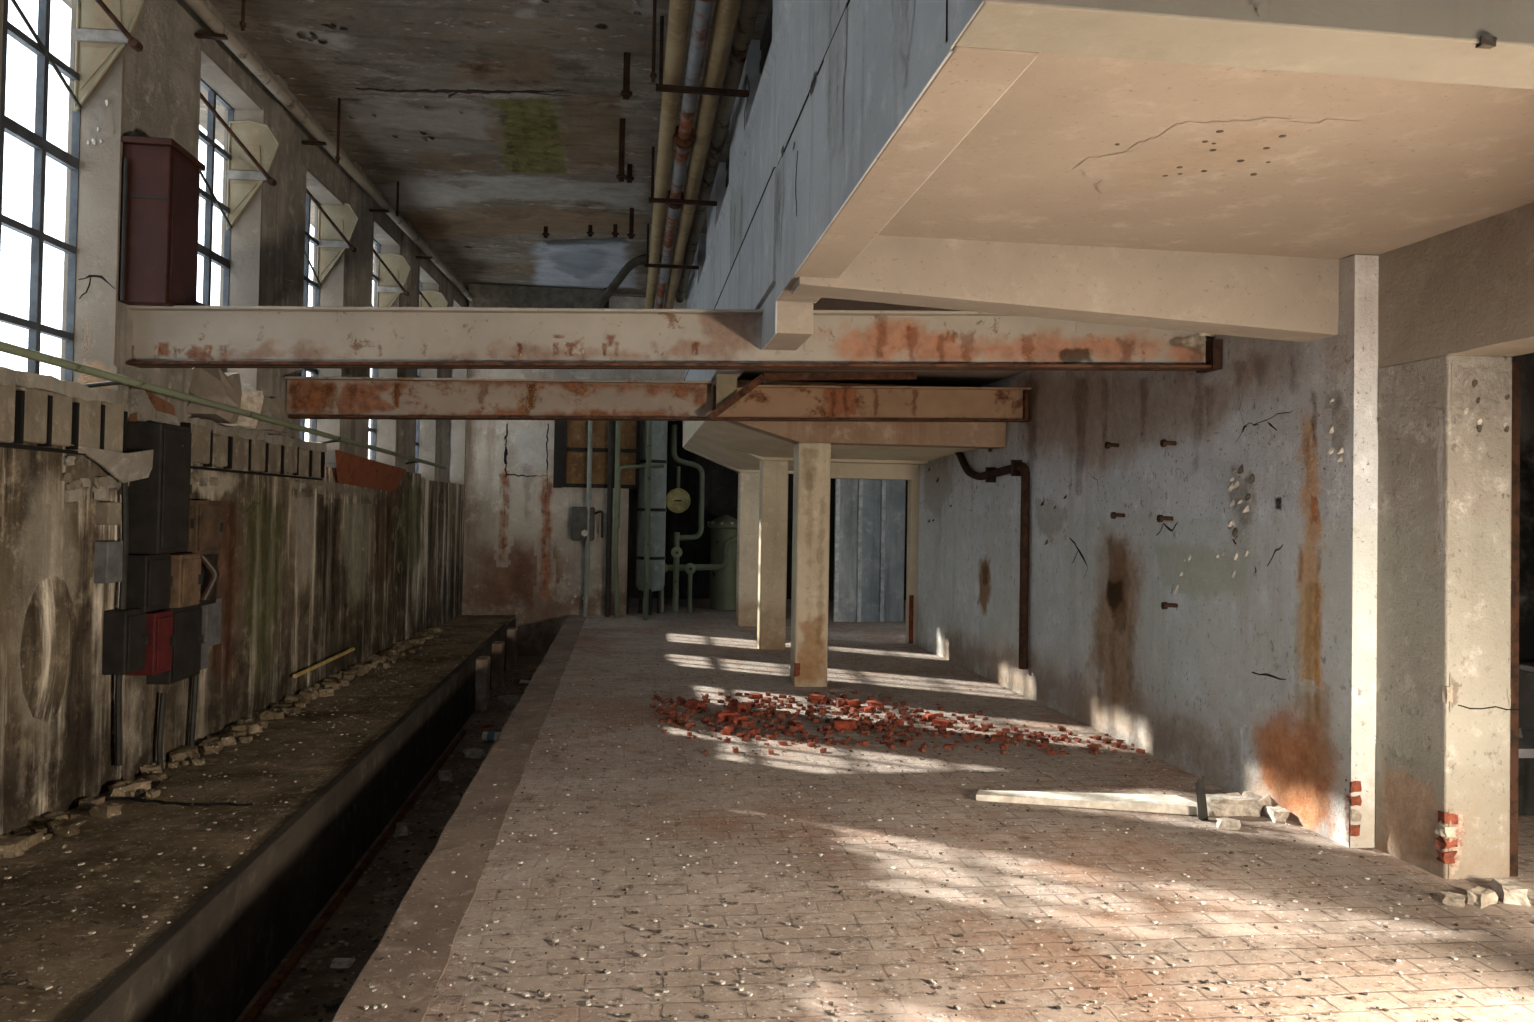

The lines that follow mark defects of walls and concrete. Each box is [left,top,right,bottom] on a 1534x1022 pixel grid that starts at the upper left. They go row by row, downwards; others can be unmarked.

corrosion [154,335,390,362]
corrosion [421,314,767,363]
corrosion [288,380,711,417]
corrosion [494,464,515,567]
corrosion [533,470,558,605]
corrosion [1291,402,1332,688]
corrosion [976,549,994,621]